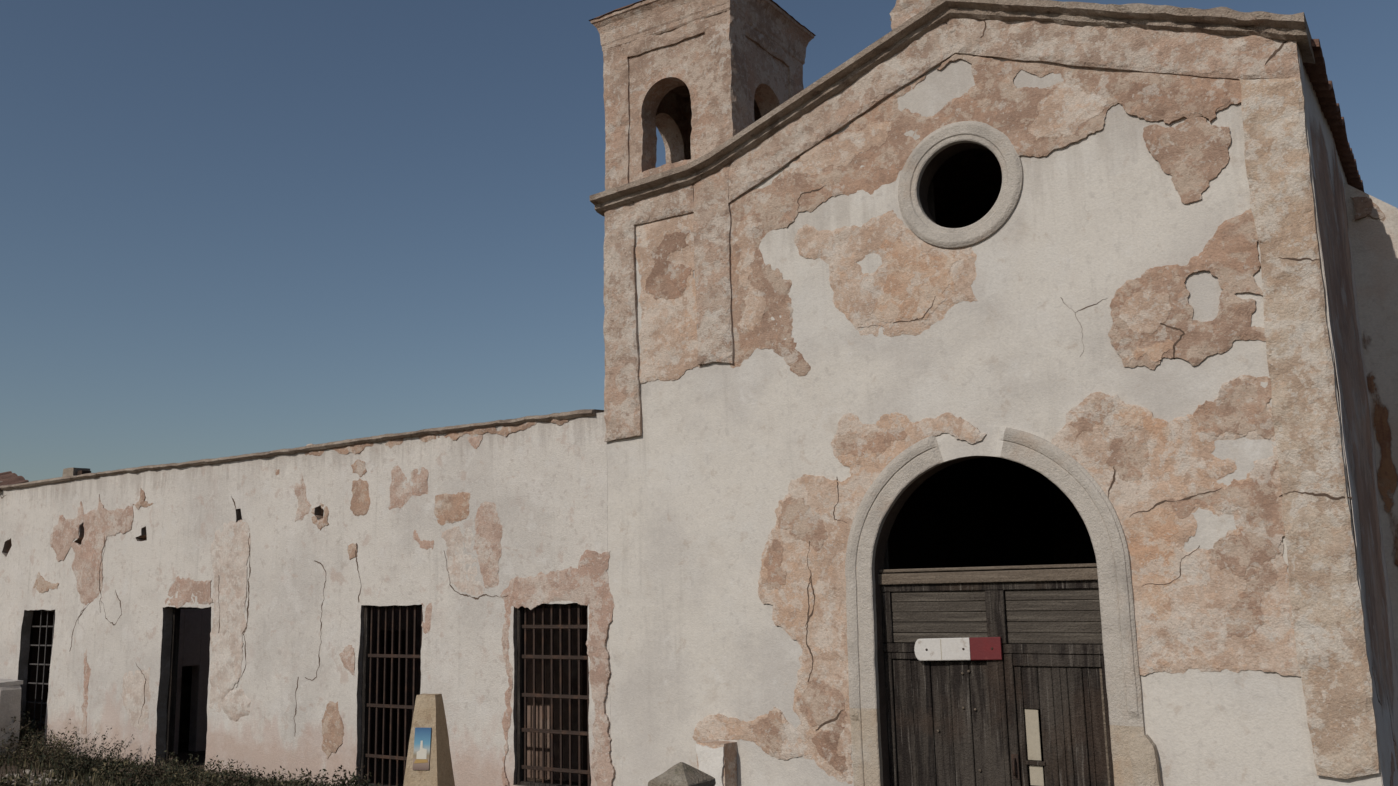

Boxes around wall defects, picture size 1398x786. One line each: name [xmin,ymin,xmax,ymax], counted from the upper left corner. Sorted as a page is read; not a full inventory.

peeling [730,53,1242,376]
peeling [1108,208,1266,370]
peeling [50,488,153,605]
peeling [163,520,251,713]
peeling [388,465,615,786]
crack [805,478,847,682]
peeling [693,412,986,784]
crack [1108,467,1221,515]
crack [1143,546,1200,586]
peeling [1051,375,1301,677]
crack [1279,491,1353,500]
damp [1310,126,1393,708]